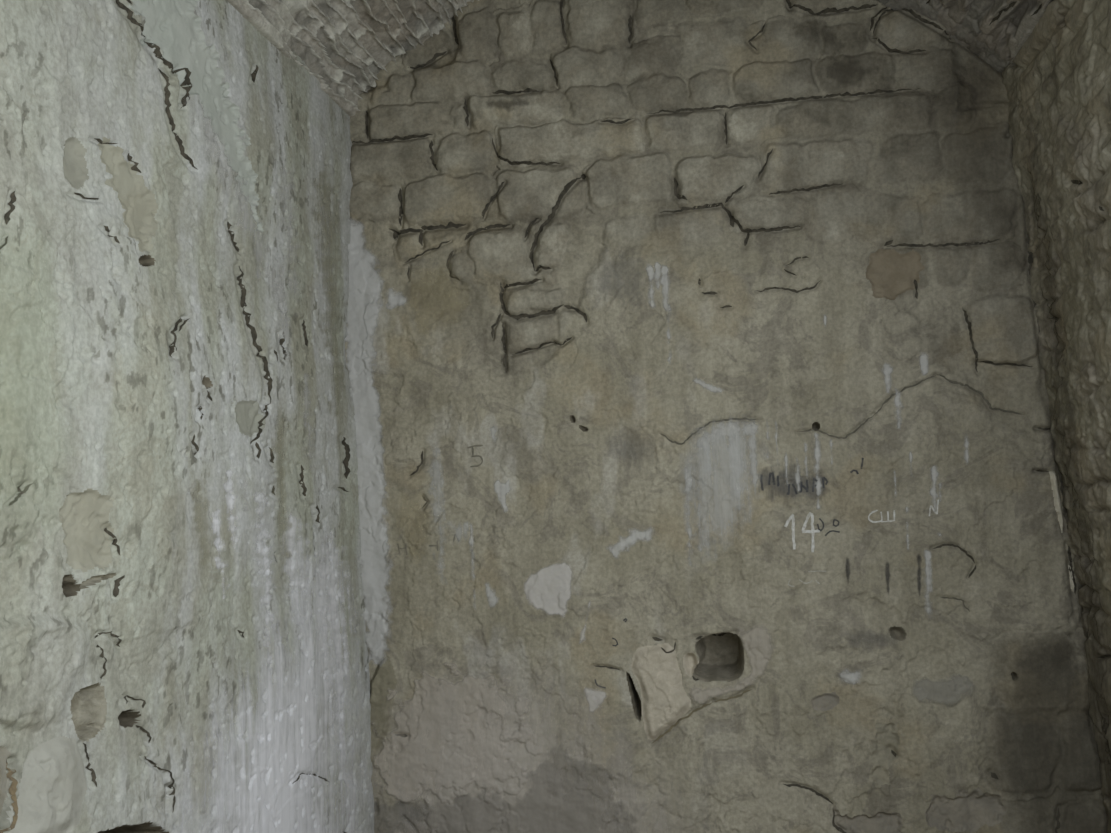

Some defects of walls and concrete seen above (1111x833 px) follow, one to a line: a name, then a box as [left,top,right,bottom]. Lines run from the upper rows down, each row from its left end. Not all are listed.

crack [116,0,198,170]
crack [390,138,587,368]
crack [660,149,841,246]
water stain [317,214,406,663]
crack [104,528,125,597]
water stain [213,471,235,567]
water stain [255,495,273,623]
crack [125,695,176,811]
water stain [216,516,355,833]
water stain [406,698,595,833]
spalling [626,671,642,722]
spalling [683,627,771,703]